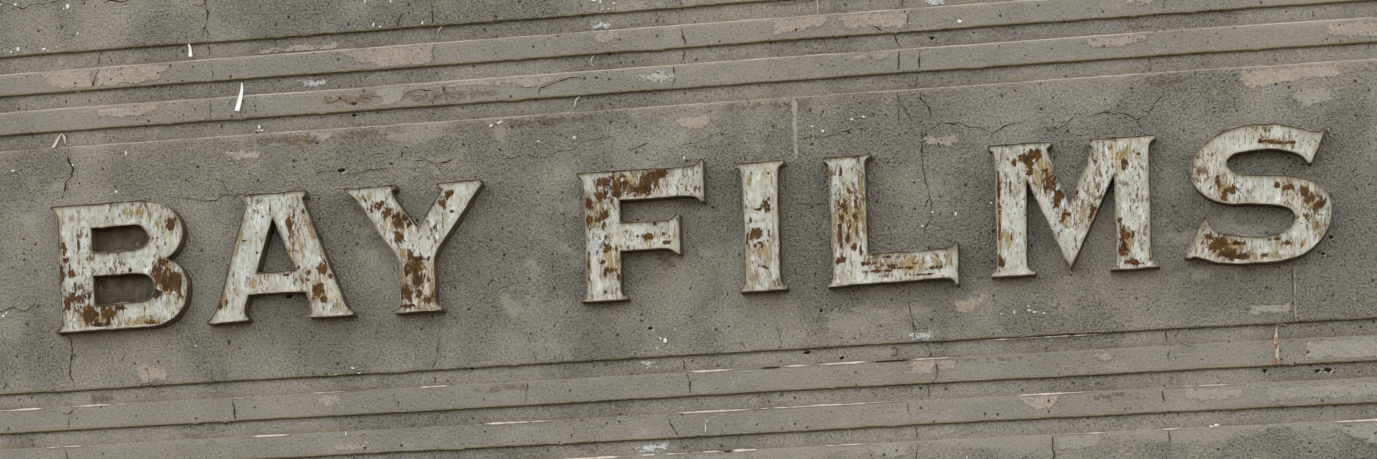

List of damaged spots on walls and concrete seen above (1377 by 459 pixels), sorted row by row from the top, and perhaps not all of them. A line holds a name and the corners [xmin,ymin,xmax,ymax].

crack [62,136,74,200]
rust [59,212,187,329]
crack [194,0,234,119]
rust [356,193,435,310]
crack [370,0,447,102]
crack [315,136,648,174]
crack [521,77,578,93]
rust [585,169,676,298]
rust [831,167,952,276]
crack [869,0,1166,238]
rust [997,146,1143,273]
rust [1190,172,1327,261]